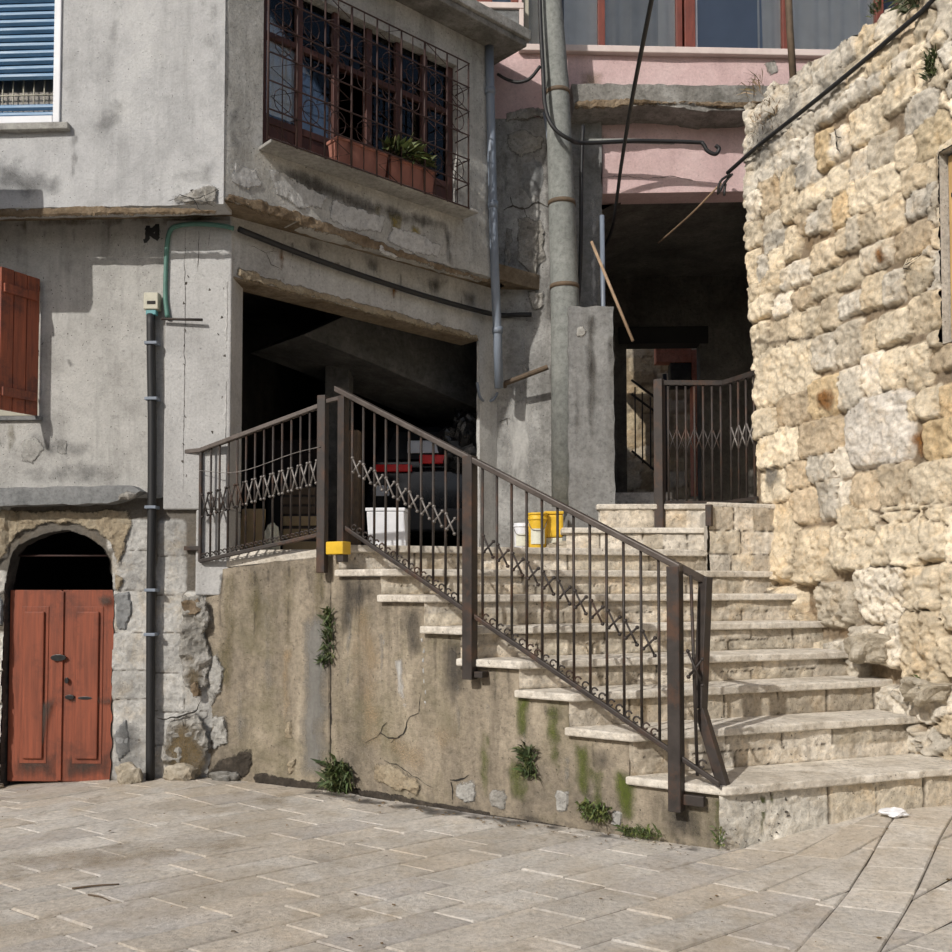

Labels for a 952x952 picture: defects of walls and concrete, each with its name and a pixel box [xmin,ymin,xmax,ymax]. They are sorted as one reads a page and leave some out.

peeling [0,163,489,282]
crack [504,196,548,217]
crack [169,188,219,484]
spalling [0,491,137,563]
spalling [161,595,328,790]
crack [326,622,334,750]
crack [366,700,468,800]
spalling [340,764,565,827]
peeling [555,790,569,812]
damp [672,812,693,831]